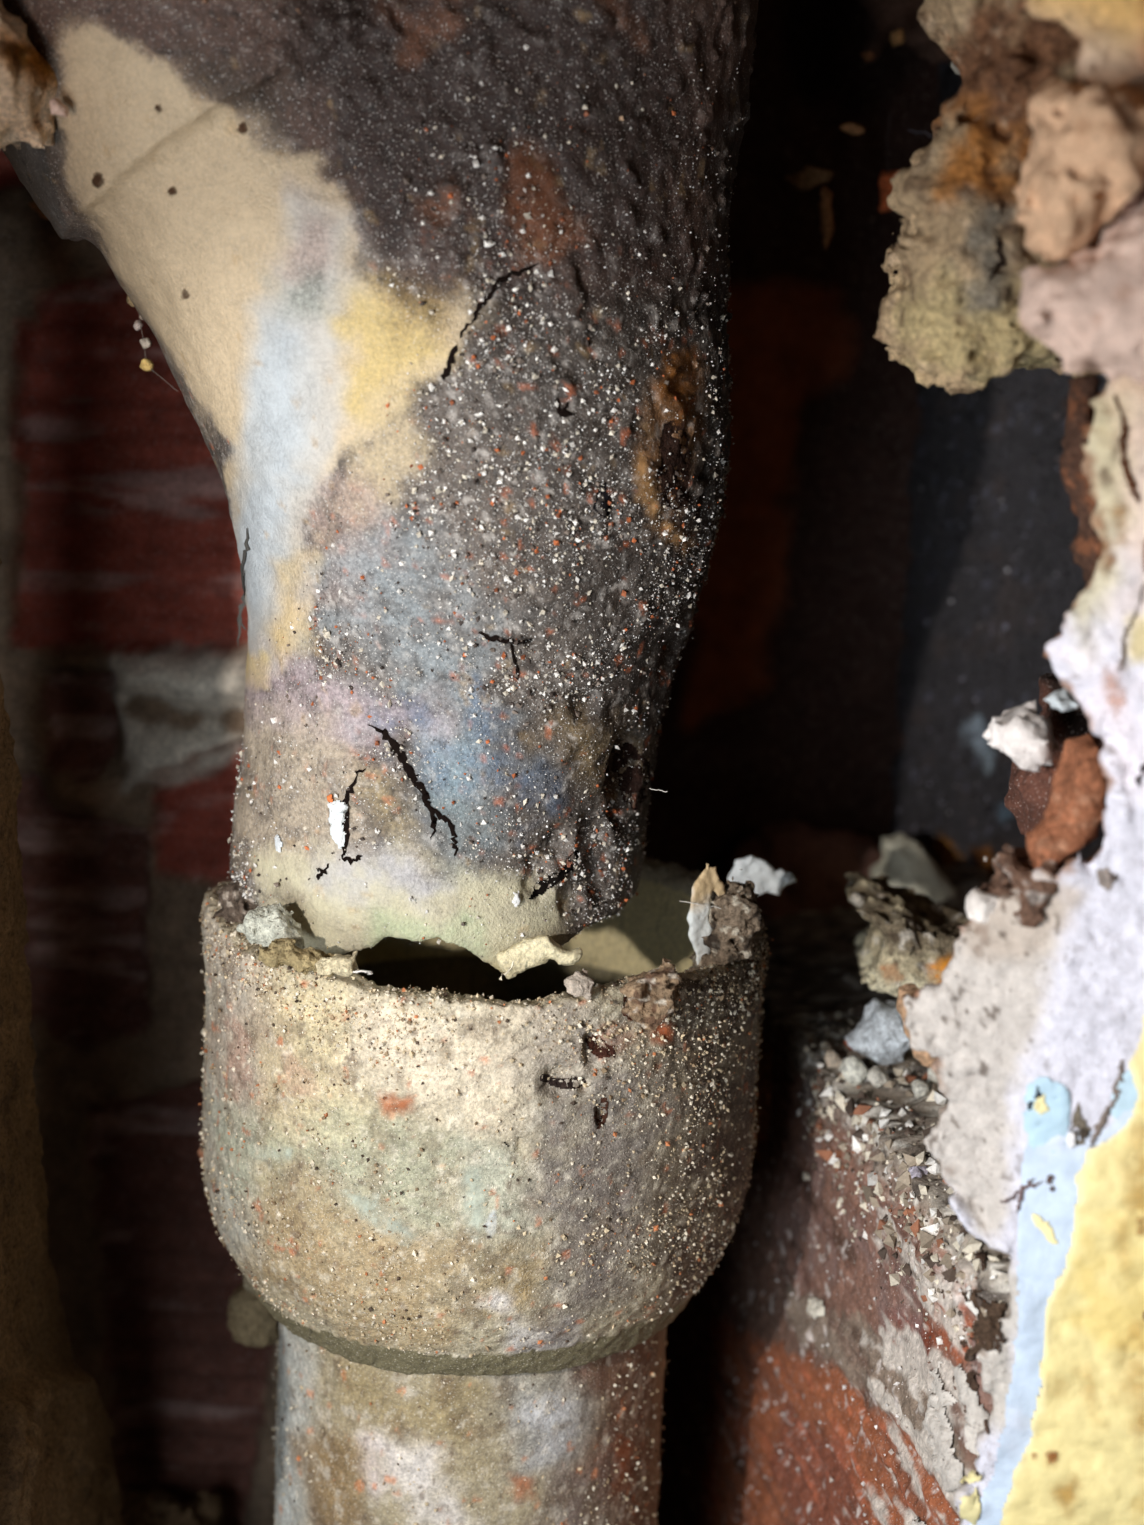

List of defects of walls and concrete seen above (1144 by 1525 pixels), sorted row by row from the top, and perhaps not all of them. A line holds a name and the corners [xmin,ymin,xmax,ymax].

crack [440,263,539,381]
corrosion [638,458,679,543]
crack [316,725,458,880]
spalling [529,849,581,899]
flaking render [965,888,998,923]